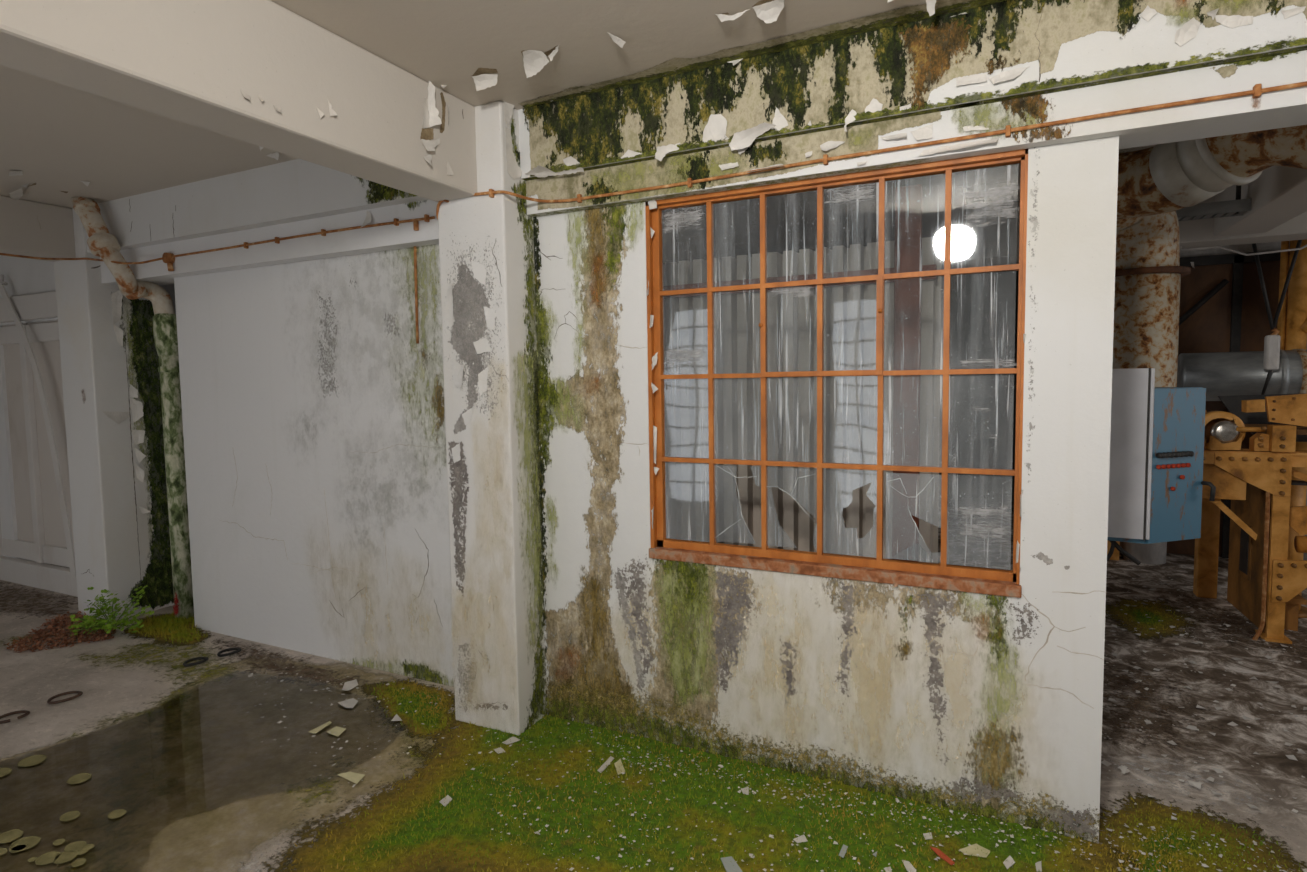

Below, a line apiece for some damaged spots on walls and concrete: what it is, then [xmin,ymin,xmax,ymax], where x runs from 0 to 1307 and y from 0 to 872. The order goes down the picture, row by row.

peeling [472,68,498,91]
peeling [504,0,1307,180]
water stain [385,232,504,440]
spalling [447,260,496,596]
water stain [536,202,643,482]
water stain [546,567,635,724]
peeling [597,756,625,775]
spalling [545,374,762,731]
peeling [834,581,862,744]
water stain [811,578,1024,796]
peeling [914,591,955,766]
peeling [1008,598,1042,646]